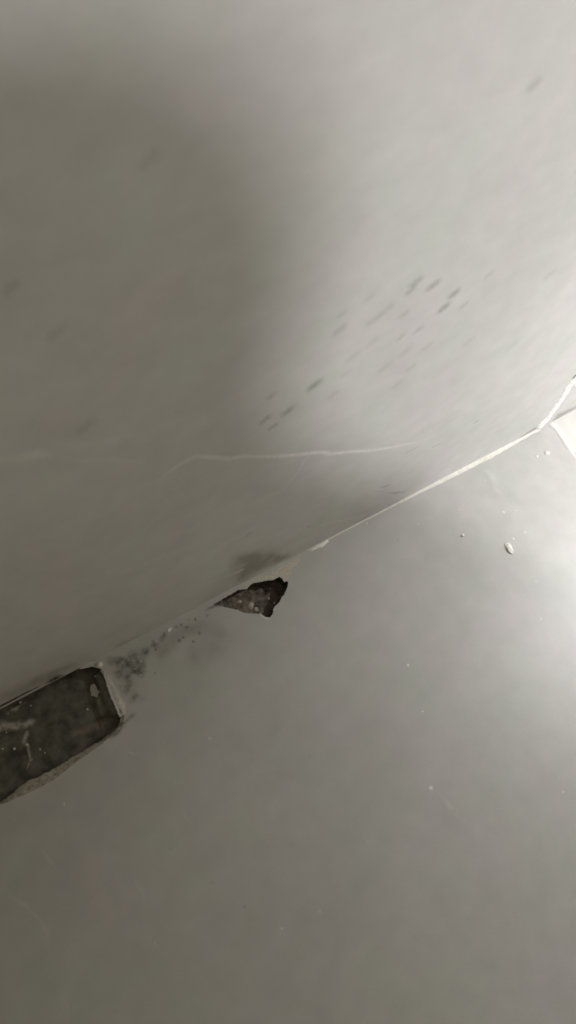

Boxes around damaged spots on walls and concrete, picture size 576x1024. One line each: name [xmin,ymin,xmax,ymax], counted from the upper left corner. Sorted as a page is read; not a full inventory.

spalling [215,540,329,620]
spalling [0,667,128,805]